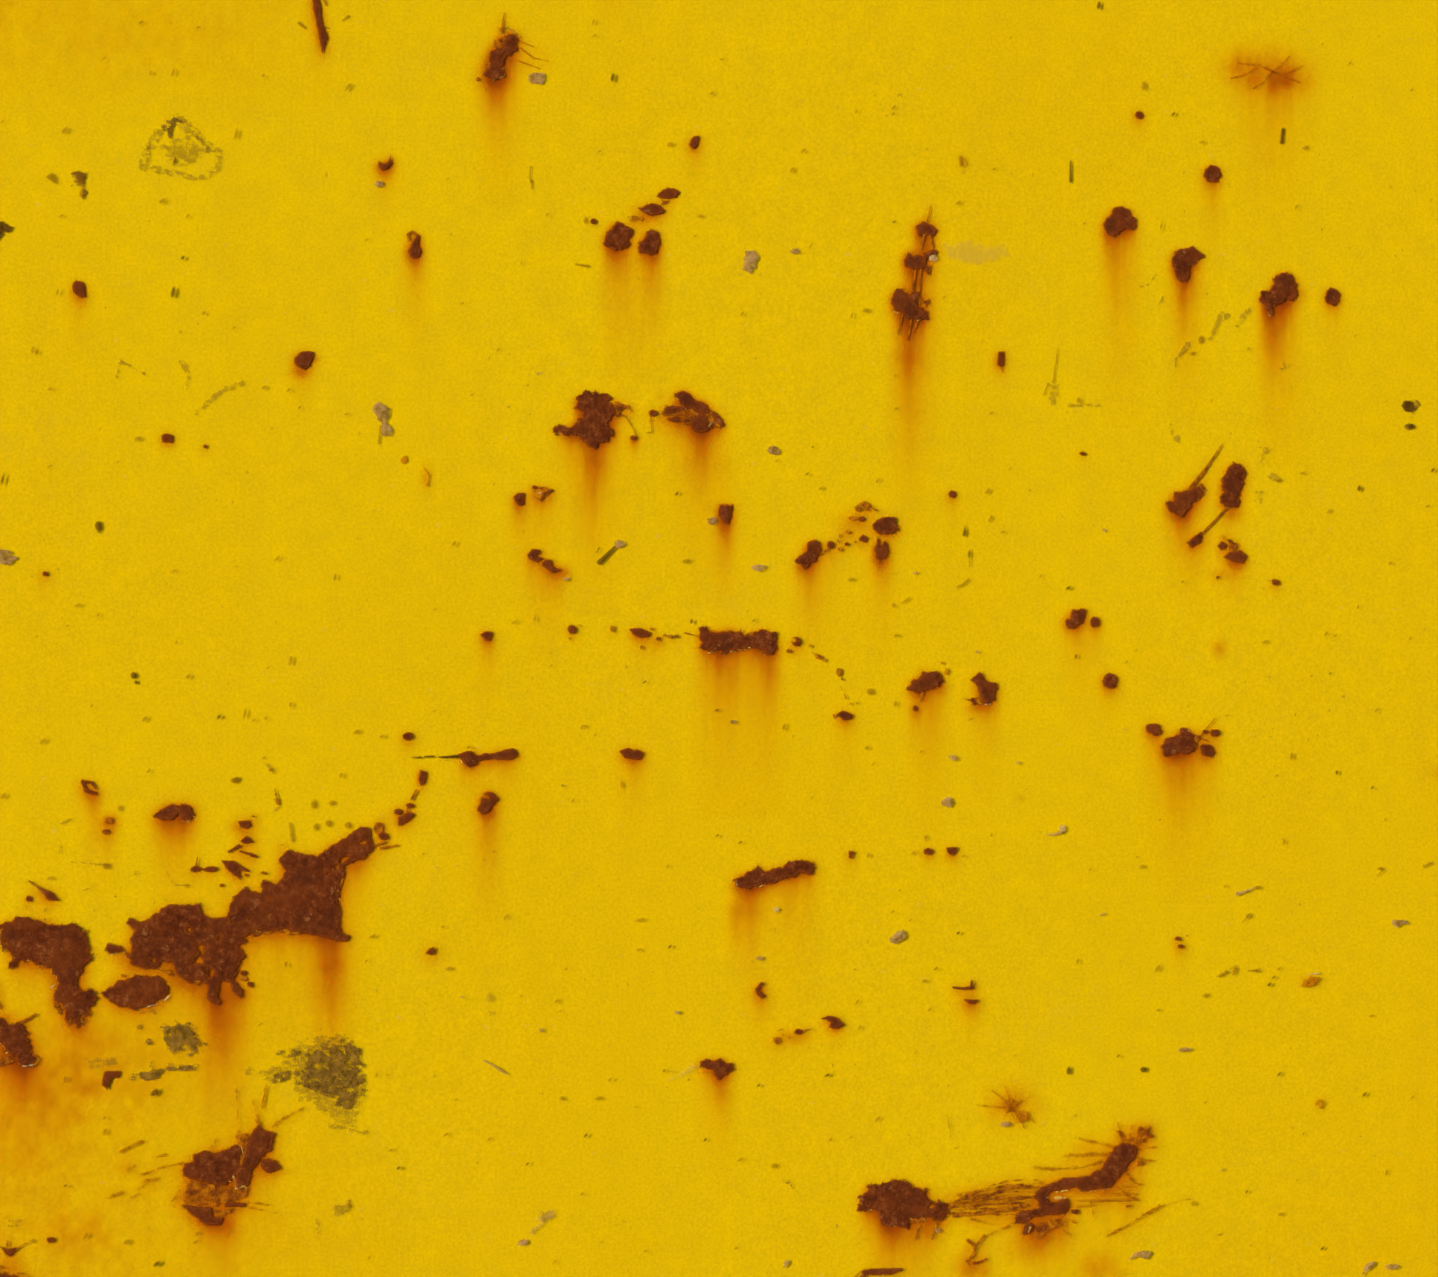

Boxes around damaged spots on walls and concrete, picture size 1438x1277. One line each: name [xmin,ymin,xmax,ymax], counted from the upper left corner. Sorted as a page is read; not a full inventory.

corrosion [585,188,679,272]
corrosion [890,206,937,383]
corrosion [1259,272,1299,351]
corrosion [553,390,638,493]
corrosion [649,391,724,465]
corrosion [795,501,898,579]
corrosion [1166,445,1247,579]
corrosion [610,626,801,685]
corrosion [0,748,517,1059]
corrosion [733,859,815,914]
corrosion [178,1088,288,1238]
corrosion [857,1126,1158,1253]